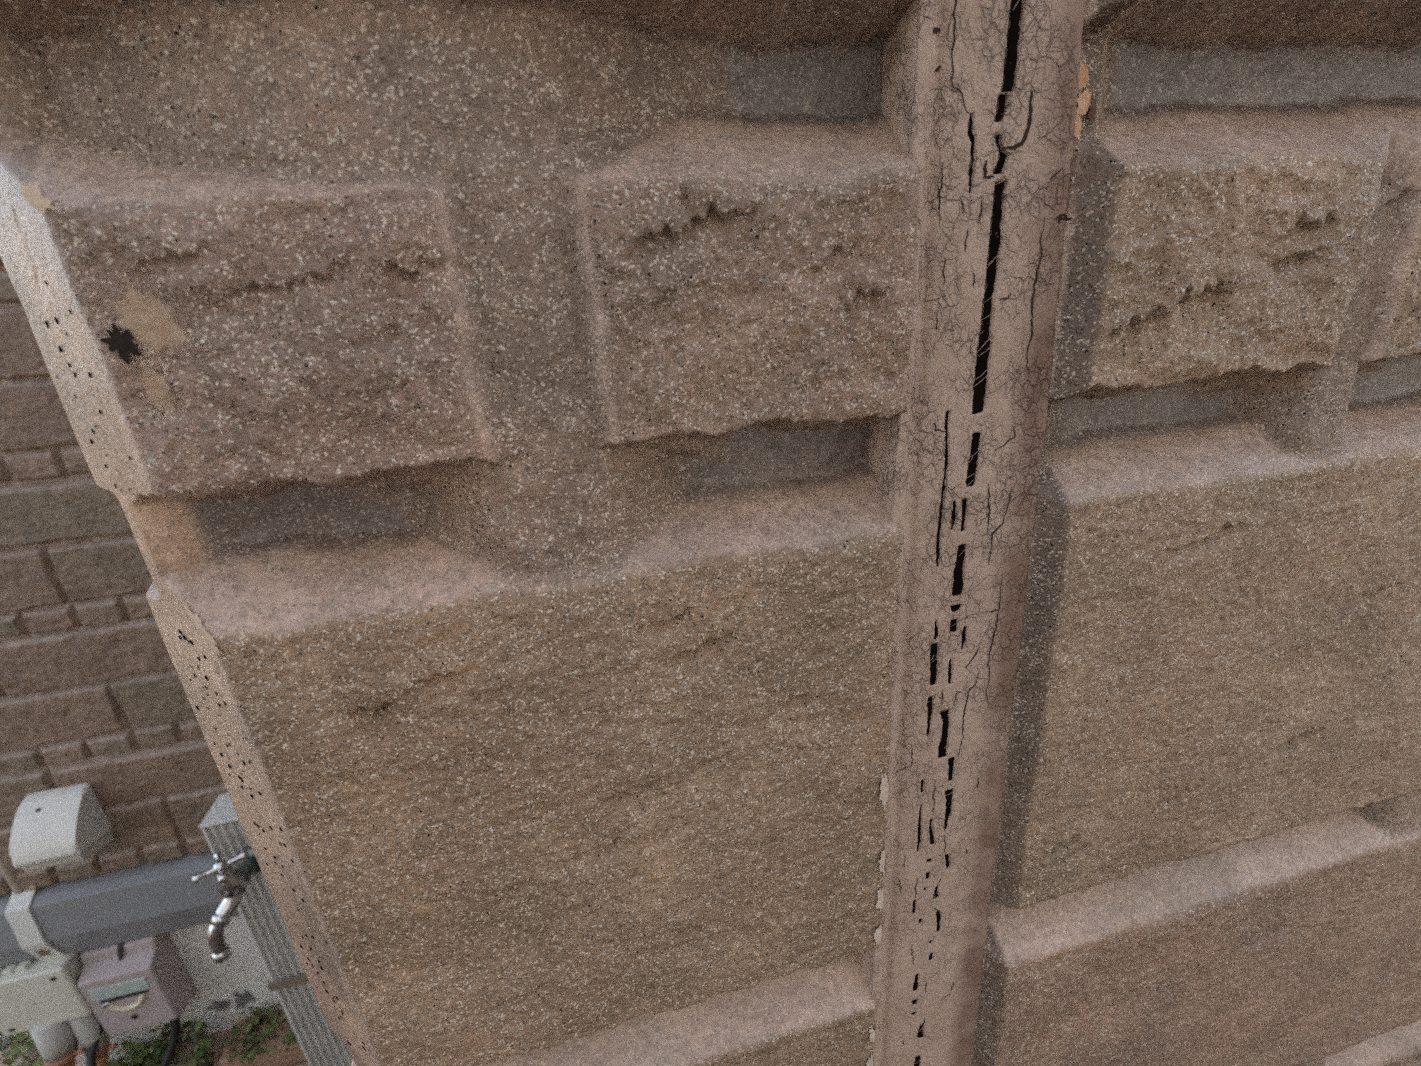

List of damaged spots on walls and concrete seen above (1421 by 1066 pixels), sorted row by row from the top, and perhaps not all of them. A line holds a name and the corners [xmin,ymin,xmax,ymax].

crack [894,0,1072,1066]